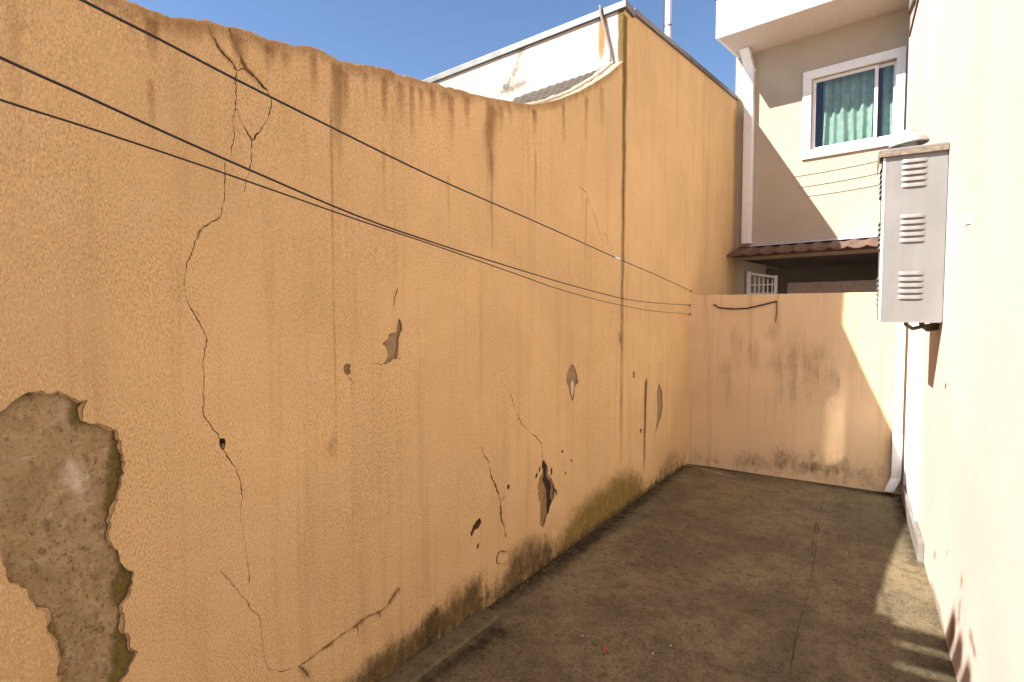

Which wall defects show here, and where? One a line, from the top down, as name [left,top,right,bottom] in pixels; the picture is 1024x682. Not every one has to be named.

crack [184,24,401,677]
spalling [383,319,402,364]
spalling [566,365,578,401]
spalling [655,385,663,433]
spalling [0,391,138,682]
crack [482,449,506,537]
spalling [535,460,557,528]
water stain [489,466,687,608]
water stain [788,478,914,558]